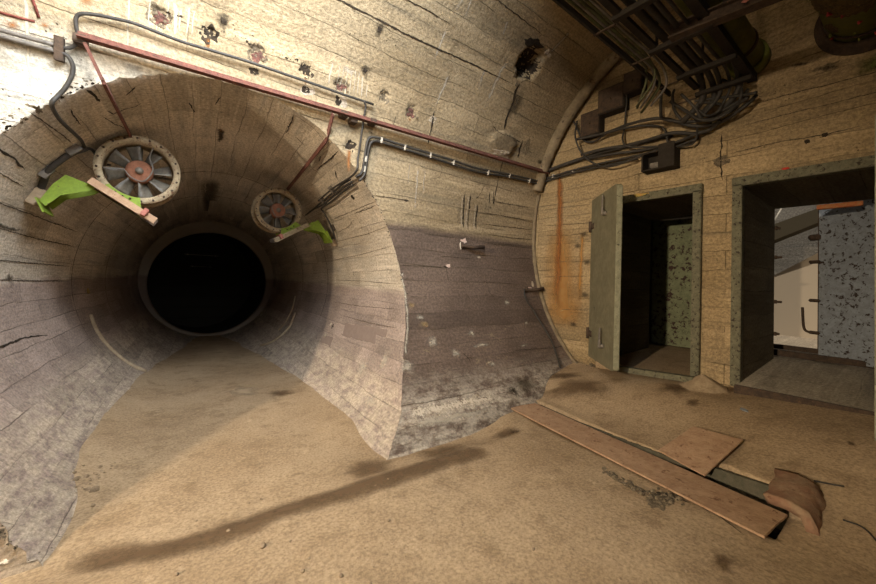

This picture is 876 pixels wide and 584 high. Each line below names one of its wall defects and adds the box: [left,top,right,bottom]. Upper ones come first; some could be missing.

spalling [0,97,43,133]
crack [87,87,140,128]
crack [339,0,546,129]
spalling [513,37,551,86]
crack [286,111,470,285]
crack [477,137,589,248]
rust [552,175,583,321]
leakage [412,393,496,424]
leakage [82,447,484,569]